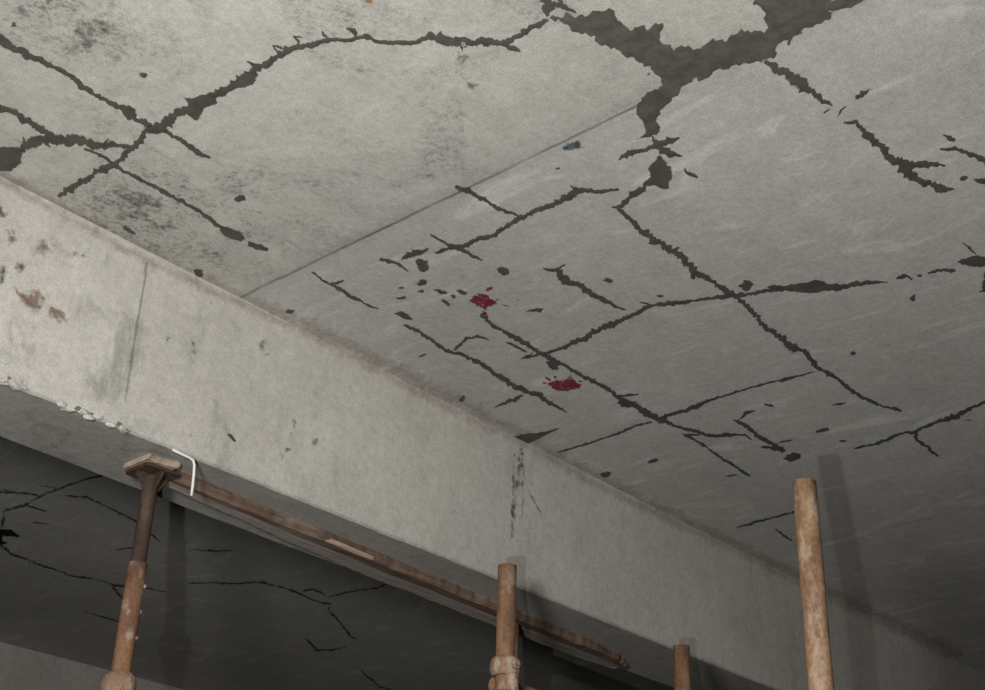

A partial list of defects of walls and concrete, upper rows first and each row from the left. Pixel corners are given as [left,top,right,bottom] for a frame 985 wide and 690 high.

crack [0,0,576,251]
crack [764,60,985,193]
corrosion [16,290,64,319]
crack [312,135,985,477]
crack [0,475,166,622]
crack [189,580,387,651]